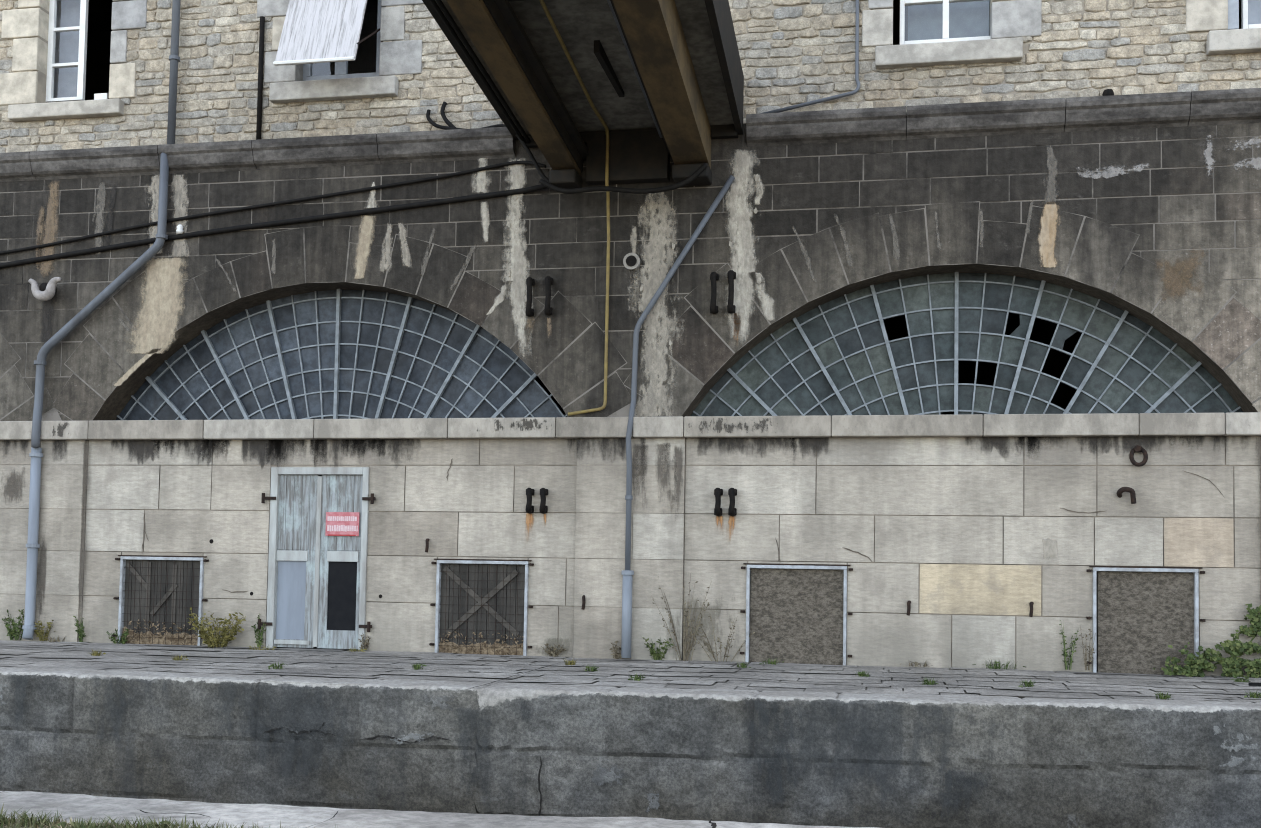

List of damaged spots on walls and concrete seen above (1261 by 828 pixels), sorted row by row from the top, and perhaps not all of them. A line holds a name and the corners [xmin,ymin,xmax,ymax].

water stain [1078,164,1148,179]
water stain [1204,135,1214,169]
water stain [355,182,435,279]
water stain [450,158,489,290]
water stain [486,159,530,354]
water stain [726,150,774,341]
water stain [889,216,900,259]
water stain [1026,146,1058,268]
water stain [112,439,419,467]
water stain [495,419,552,431]
water stain [568,438,683,501]
water stain [698,418,829,454]